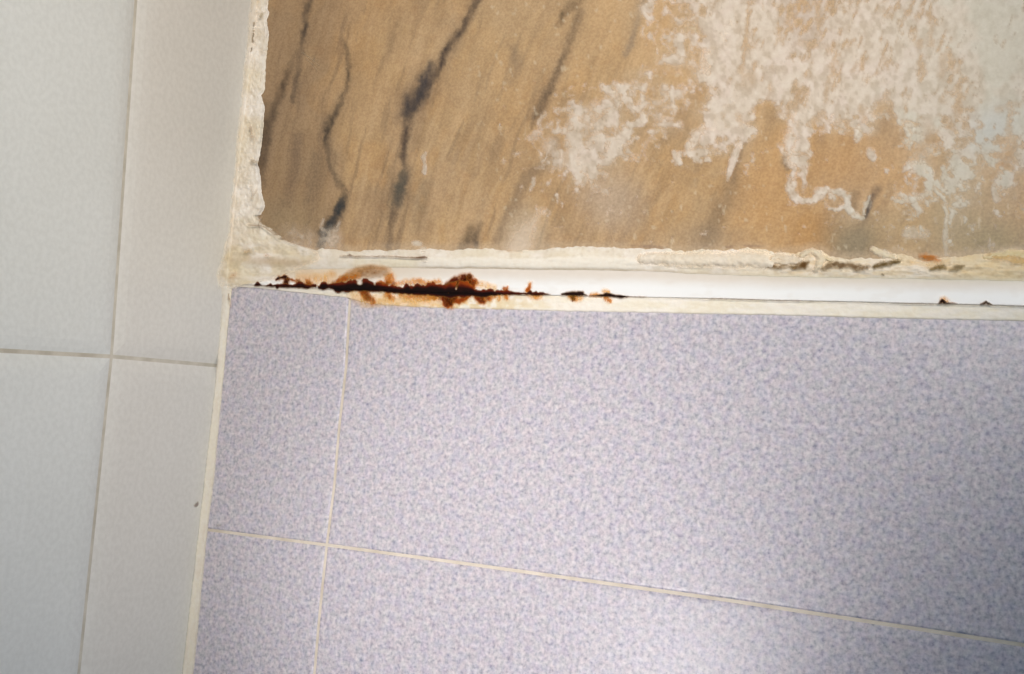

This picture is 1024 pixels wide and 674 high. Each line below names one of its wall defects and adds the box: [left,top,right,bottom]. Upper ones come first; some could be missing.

rust [254,270,641,309]